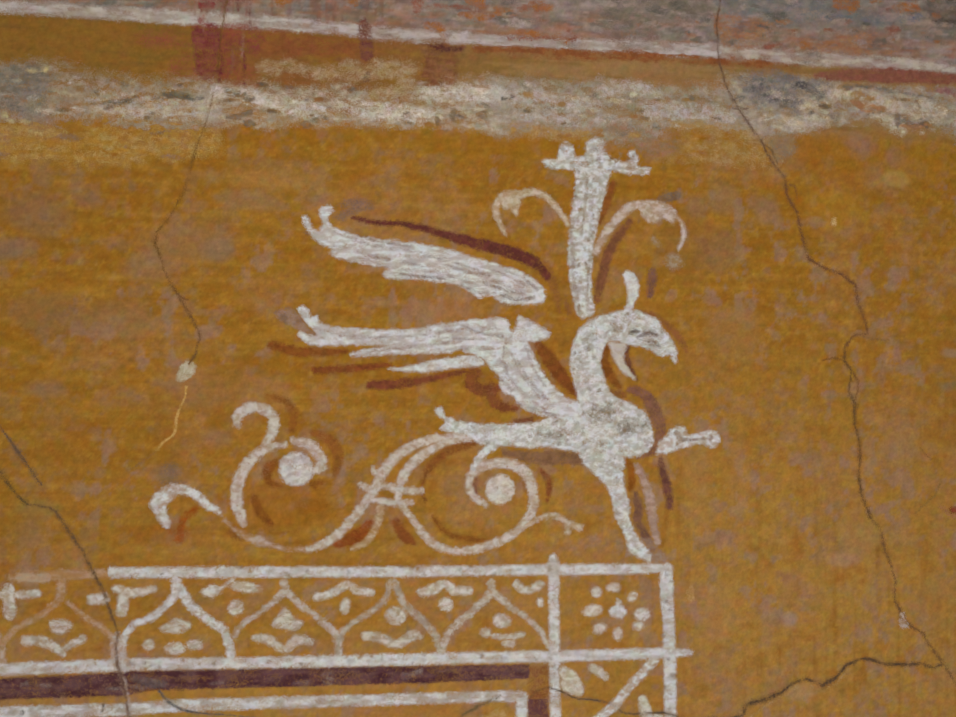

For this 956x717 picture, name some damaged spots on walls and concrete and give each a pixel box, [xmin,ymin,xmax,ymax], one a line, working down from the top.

crack [130,0,228,470]
peeling [185,56,956,171]
crack [529,0,956,717]
crack [0,425,254,717]
crack [461,694,501,717]